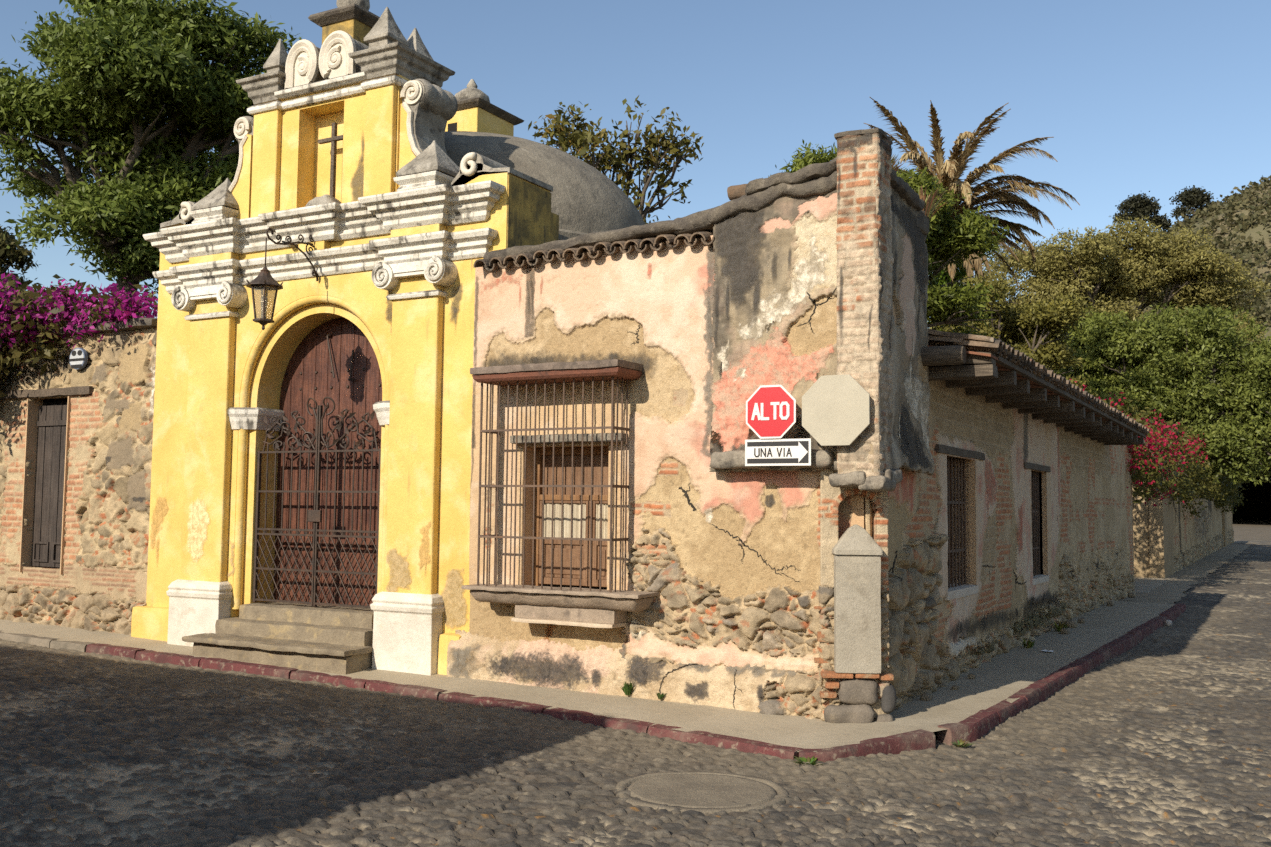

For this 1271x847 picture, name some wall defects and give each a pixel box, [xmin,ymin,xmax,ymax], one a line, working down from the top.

peeling [710,236,834,452]
flaking render [1109,445,1132,475]
crack [679,483,799,582]
damp [490,653,600,689]